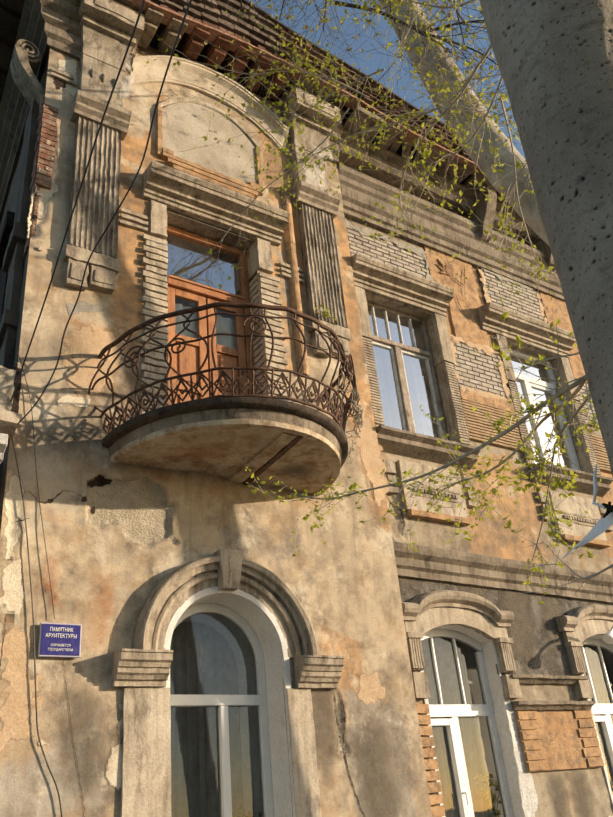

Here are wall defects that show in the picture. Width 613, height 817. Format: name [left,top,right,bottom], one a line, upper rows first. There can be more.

spalling [23,94,59,258]
crack [16,490,83,532]
flaking render [81,475,178,549]
peeling [0,472,42,751]
crack [333,689,365,817]